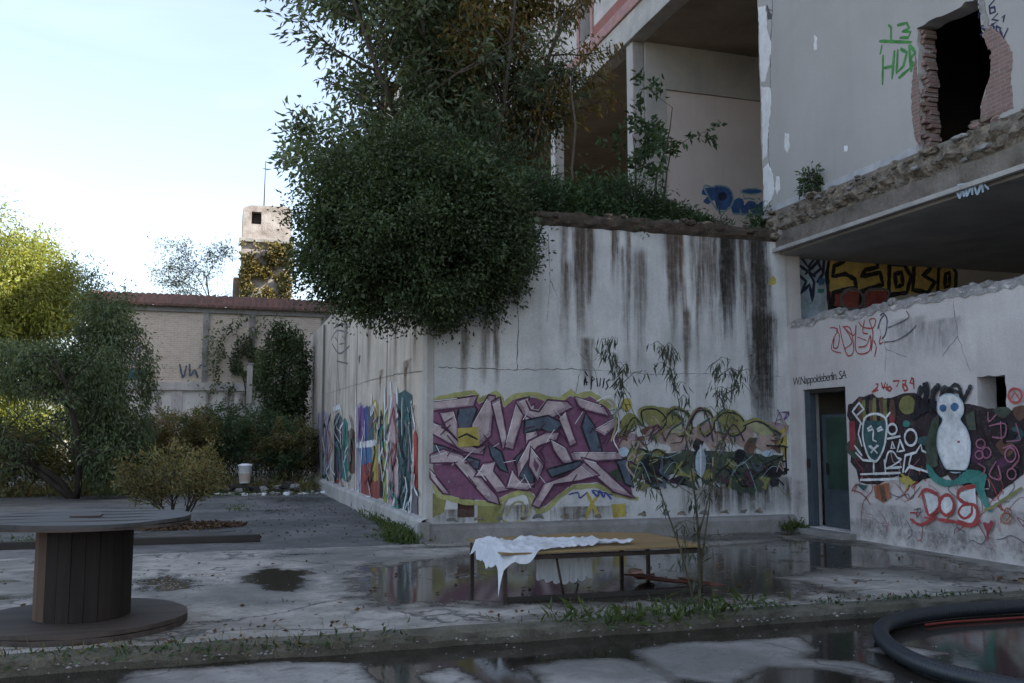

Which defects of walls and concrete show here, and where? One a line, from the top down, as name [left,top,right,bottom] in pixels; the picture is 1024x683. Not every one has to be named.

spalling [528,0,1024,242]
damp [562,227,593,306]
damp [622,231,645,300]
damp [697,236,774,408]